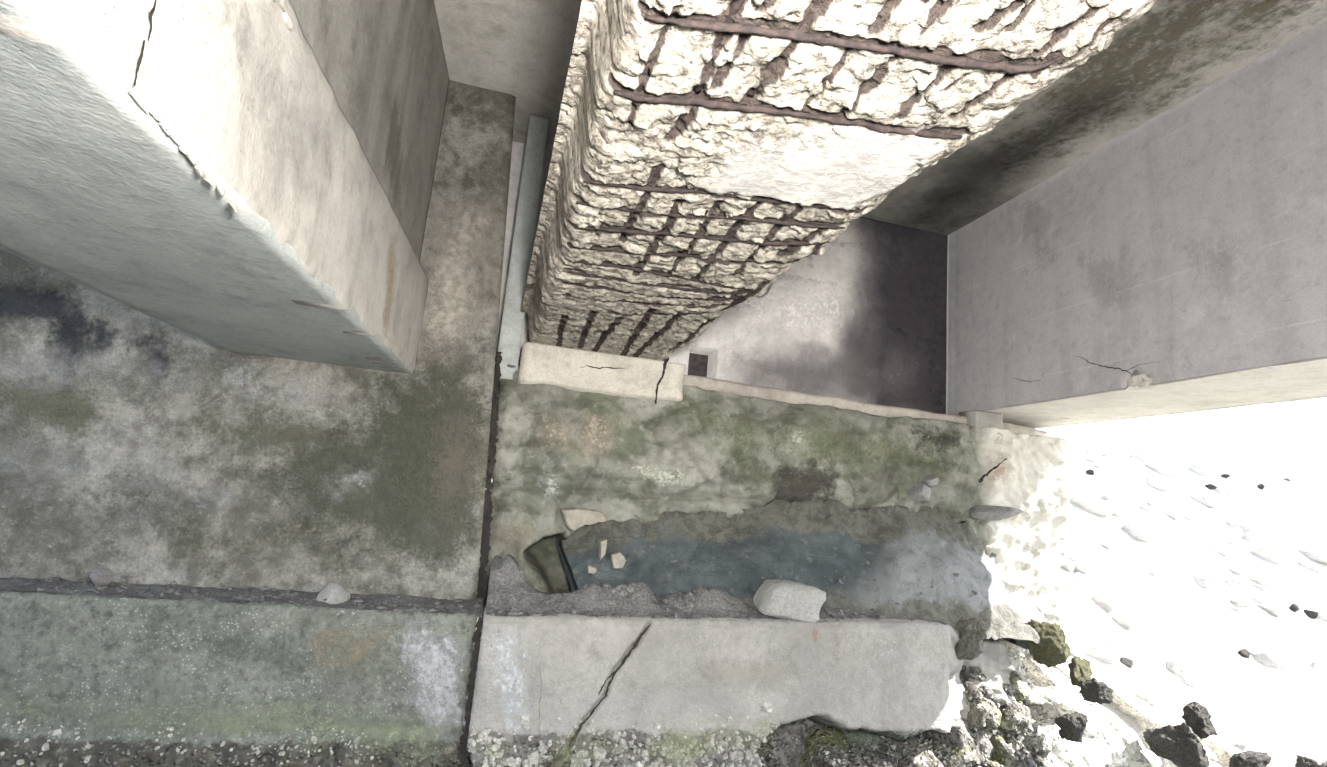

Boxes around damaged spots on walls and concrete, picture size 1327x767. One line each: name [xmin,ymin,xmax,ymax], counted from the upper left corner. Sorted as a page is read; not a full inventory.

crack [133,0,157,86]
spalling [521,0,1157,361]
leakage [740,0,1302,447]
rust [425,211,488,346]
leakage [0,283,118,380]
crack [655,349,675,404]
efflorescence [632,465,684,487]
leakage [773,463,835,502]
crack [539,623,652,767]